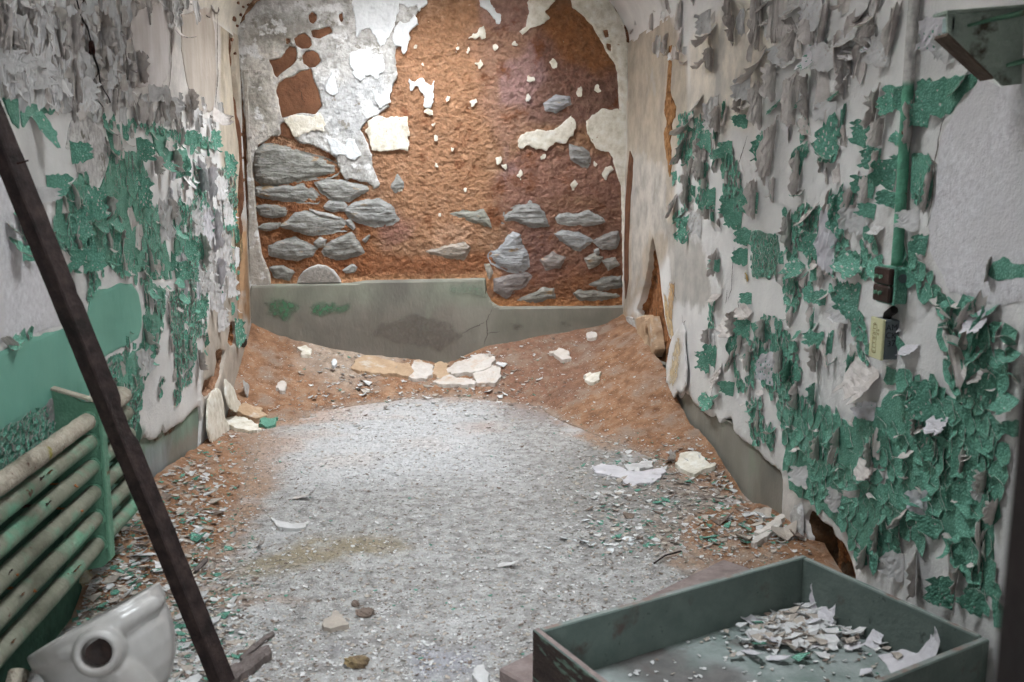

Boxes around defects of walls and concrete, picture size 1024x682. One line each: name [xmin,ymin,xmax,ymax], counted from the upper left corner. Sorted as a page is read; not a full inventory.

peeling [0,0,251,442]
peeling [642,0,1024,628]
peeling [0,398,56,470]
peeling [741,614,787,645]
peeling [806,584,836,648]